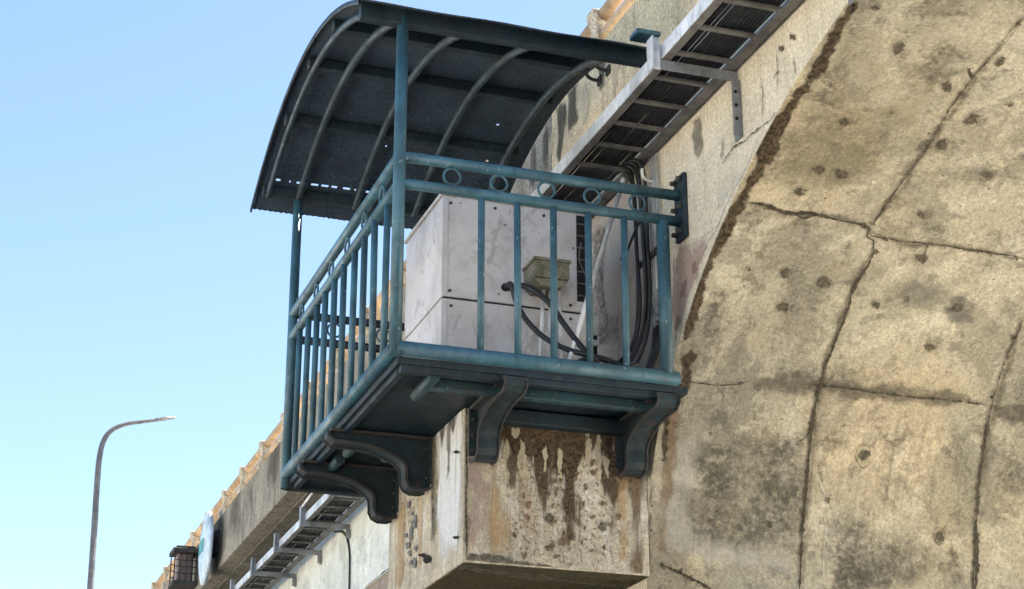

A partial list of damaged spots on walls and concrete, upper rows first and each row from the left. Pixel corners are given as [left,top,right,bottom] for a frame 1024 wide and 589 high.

crack [720,53,796,167]
water stain [673,2,858,389]
crack [749,17,1024,589]
crack [681,380,749,422]
rust [620,476,643,574]
crack [660,563,711,589]
water stain [693,438,802,550]
water stain [814,469,911,589]